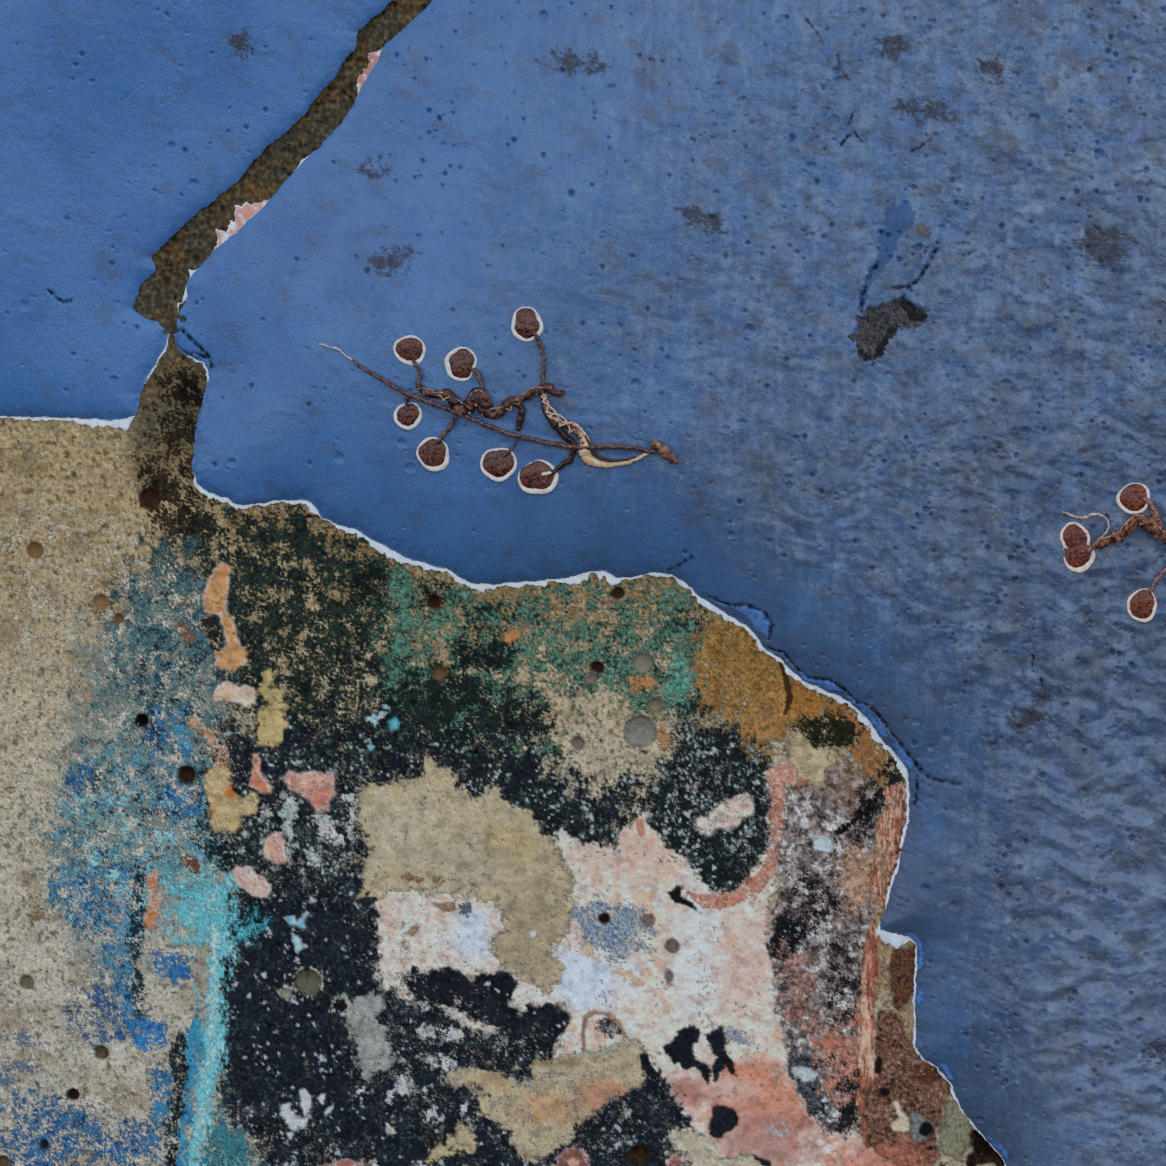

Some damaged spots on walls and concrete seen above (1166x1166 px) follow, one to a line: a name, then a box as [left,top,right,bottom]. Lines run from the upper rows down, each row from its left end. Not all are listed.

peeling [848,294,930,366]
peeling [0,333,1008,1166]